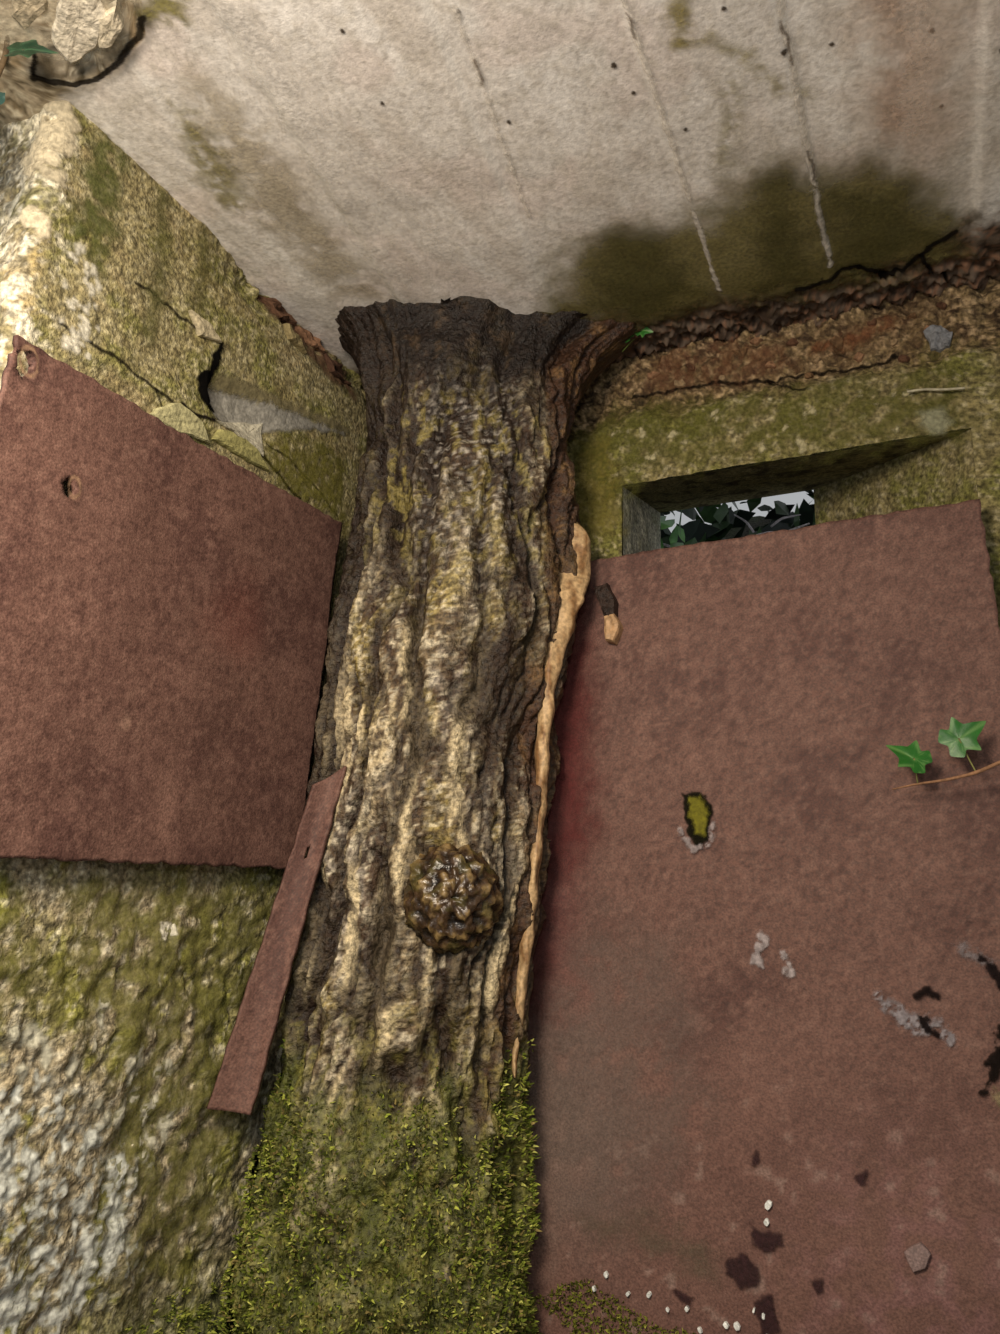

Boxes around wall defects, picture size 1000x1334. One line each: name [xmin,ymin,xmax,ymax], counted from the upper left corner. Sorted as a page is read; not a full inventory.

crack [29,15,147,88]
crack [794,230,958,292]
crack [134,281,196,329]
crack [59,308,175,407]
rust [554,655,581,838]
rust [678,792,715,853]
rust [959,943,1000,989]
rust [874,986,955,1046]
rust [978,1024,1000,1106]